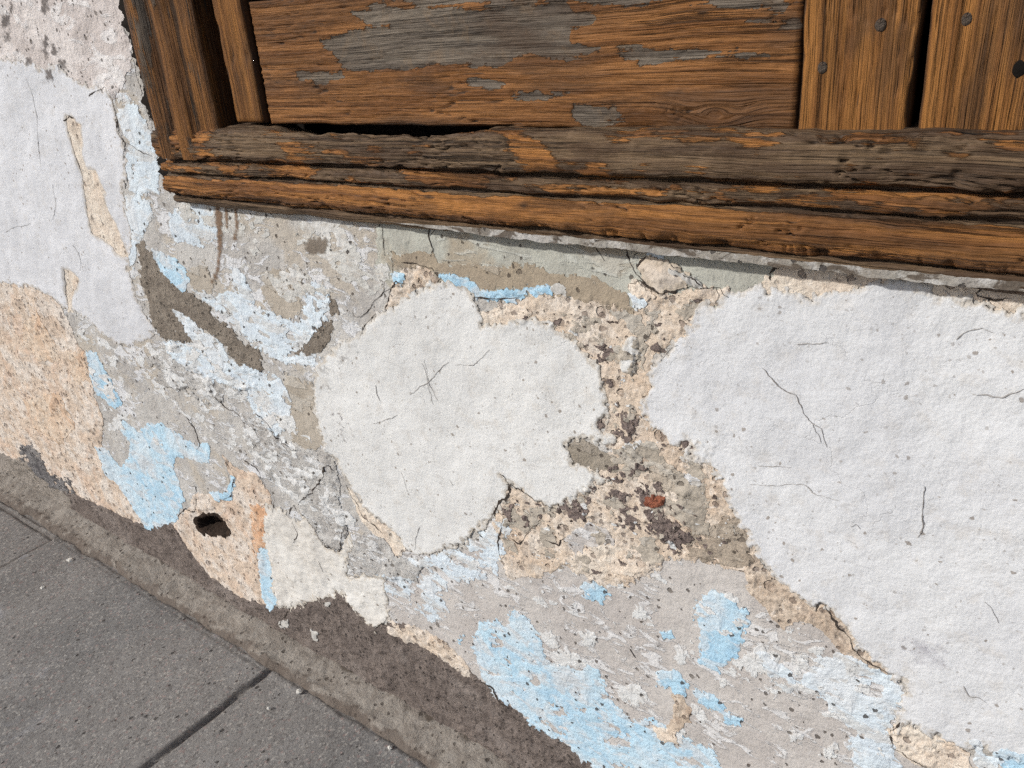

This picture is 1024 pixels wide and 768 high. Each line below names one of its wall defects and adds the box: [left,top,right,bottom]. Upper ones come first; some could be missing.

leakage [211,207,239,283]
flaking render [0,59,592,768]
spalling [375,223,1024,588]
crack [762,368,827,447]
flaking render [347,518,1024,768]
crack [816,605,889,674]